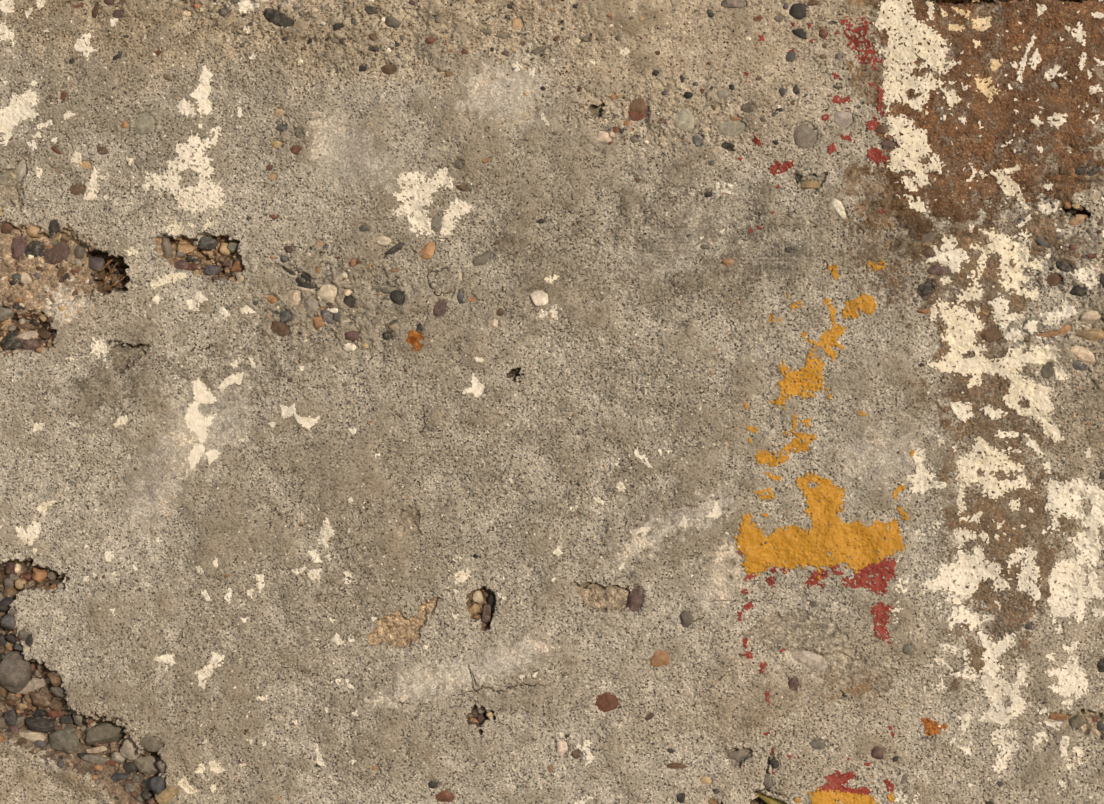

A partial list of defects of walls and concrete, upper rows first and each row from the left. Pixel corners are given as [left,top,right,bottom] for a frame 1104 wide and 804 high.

spalling [0,61,139,356]
peeling [119,58,244,316]
peeling [219,297,255,319]
peeling [734,0,1104,794]
spalling [0,500,230,804]
peeling [200,588,262,625]
peeling [244,562,265,599]
peeling [285,508,350,581]
peeling [315,604,355,646]
spalling [368,556,506,650]
spalling [724,747,753,768]
peeling [794,758,920,804]